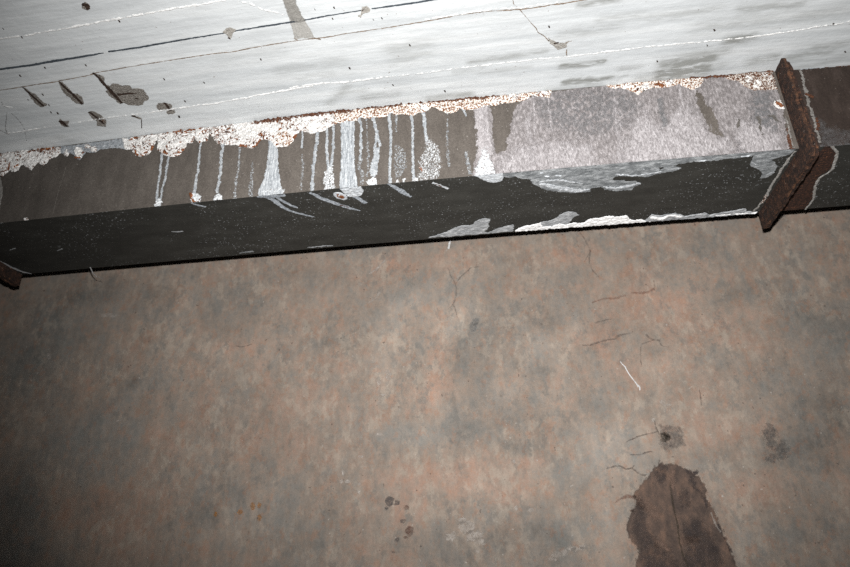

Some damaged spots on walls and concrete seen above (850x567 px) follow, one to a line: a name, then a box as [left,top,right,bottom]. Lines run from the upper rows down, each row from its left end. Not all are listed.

spalling [22,87,69,127]
spalling [59,81,106,127]
spalling [85,64,180,128]
crack [0,0,583,141]
water stain [0,70,796,249]
rust [782,146,839,211]
water stain [627,463,736,567]